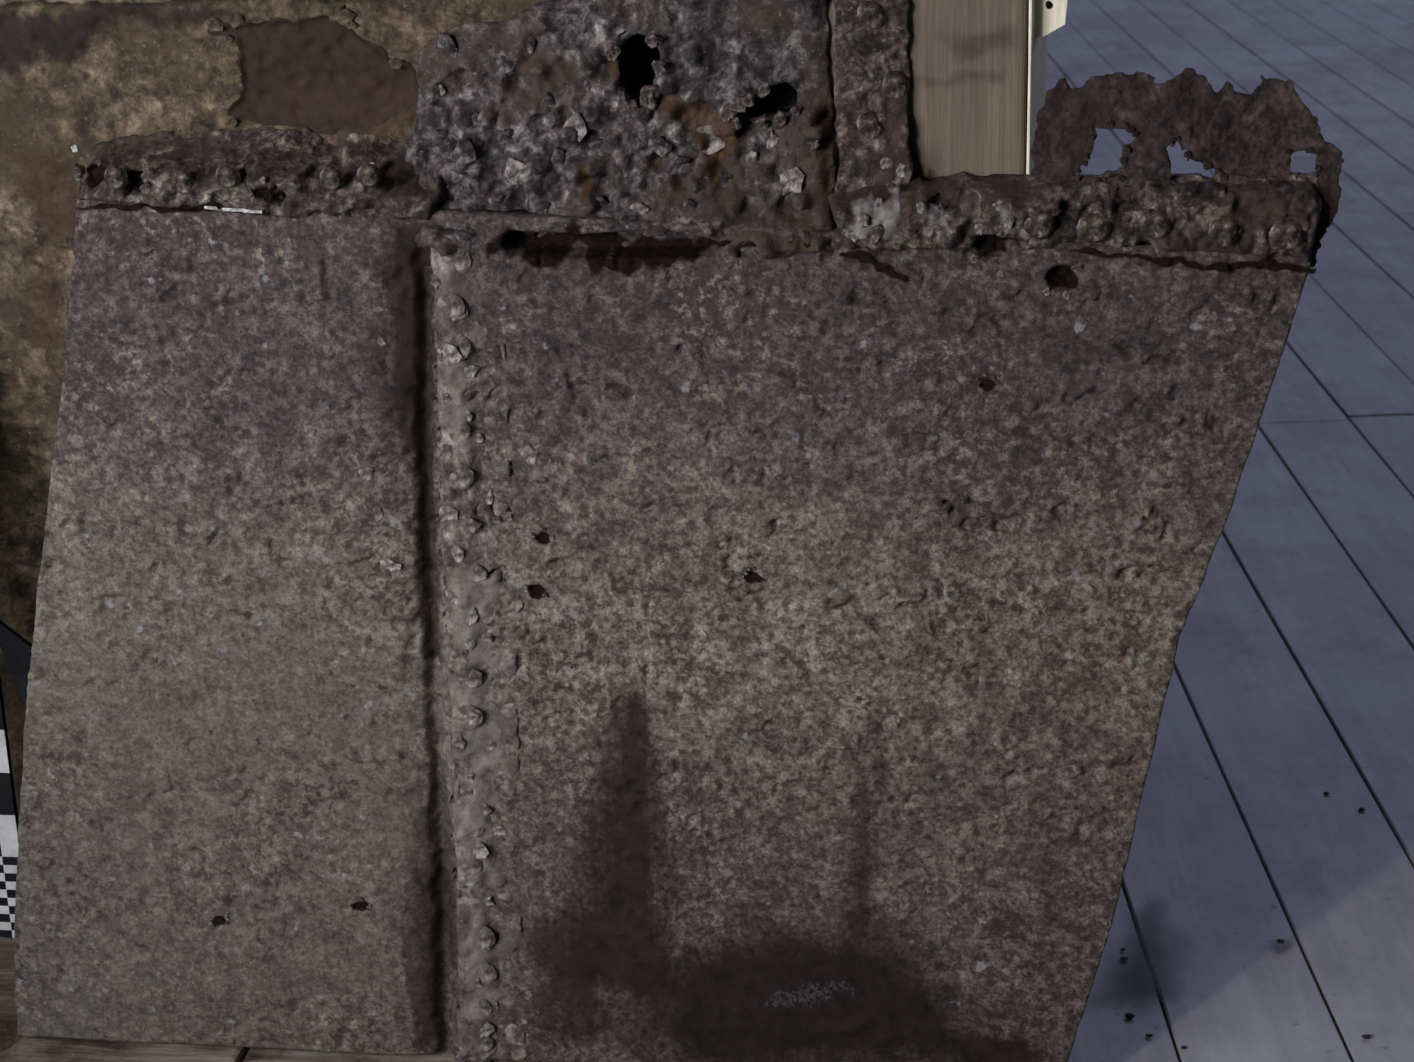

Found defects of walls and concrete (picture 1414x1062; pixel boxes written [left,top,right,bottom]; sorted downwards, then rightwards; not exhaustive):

spalling [204,0,947,259]
corrosion [659,93,741,182]
damp [536,693,1037,1062]